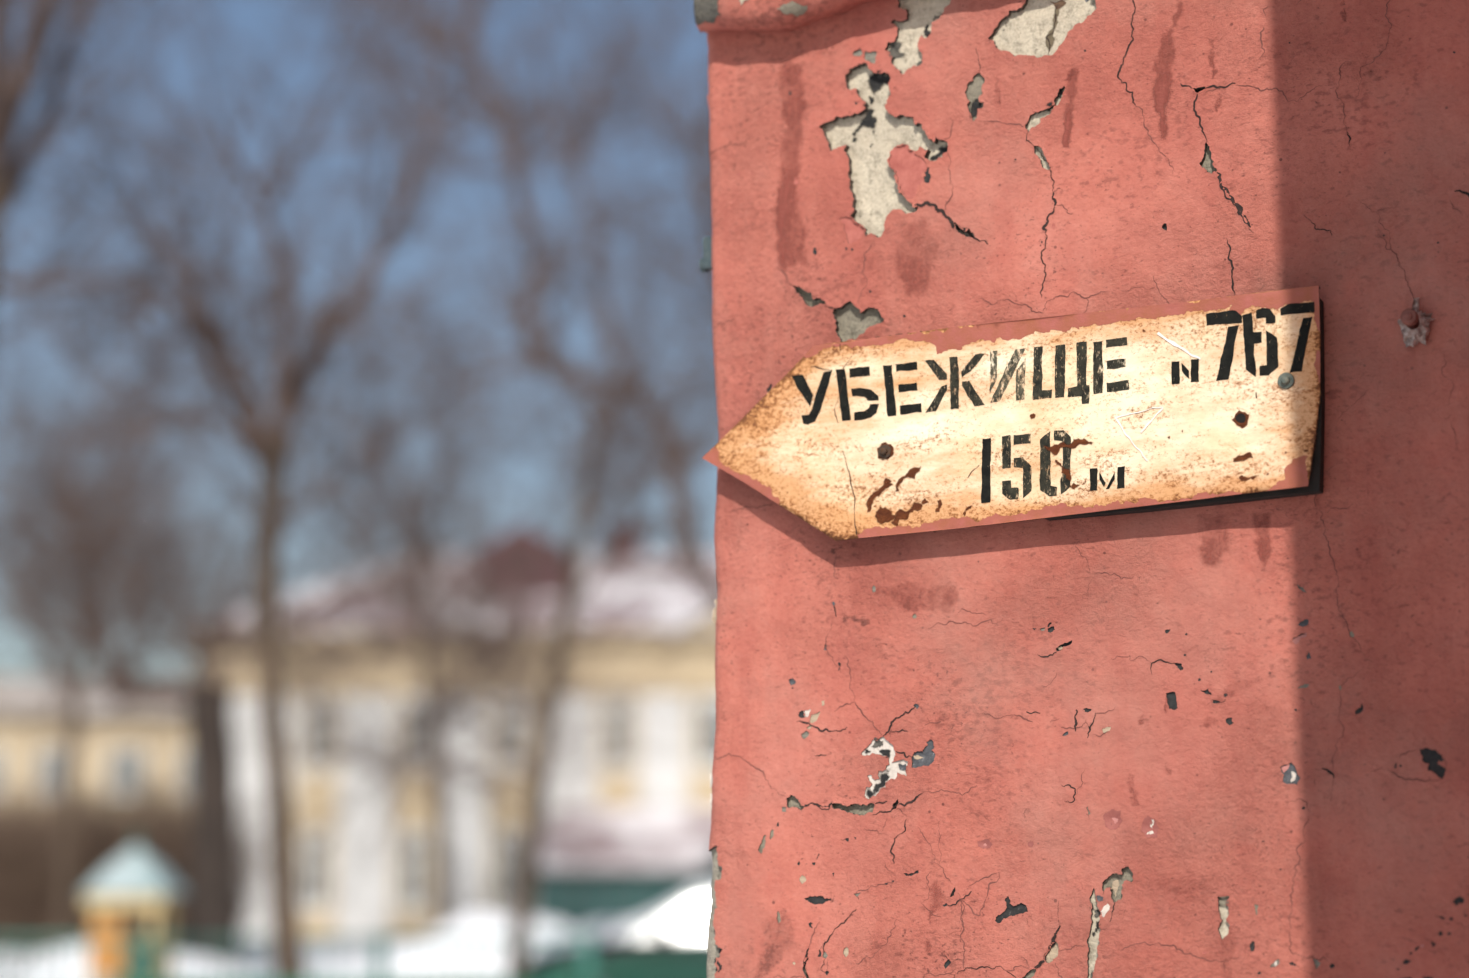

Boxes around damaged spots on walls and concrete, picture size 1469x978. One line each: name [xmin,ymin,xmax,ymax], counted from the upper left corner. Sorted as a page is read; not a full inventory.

peeling [777,0,951,342]
peeling [966,0,1096,121]
crack [915,89,1169,313]
crack [1117,0,1392,292]
peeling [759,701,941,853]
crack [824,559,882,735]
crack [929,608,1002,629]
crack [976,641,1115,803]
crack [1103,494,1373,978]
peeling [1371,748,1447,782]
crack [778,785,1085,978]
peeling [1088,867,1133,978]